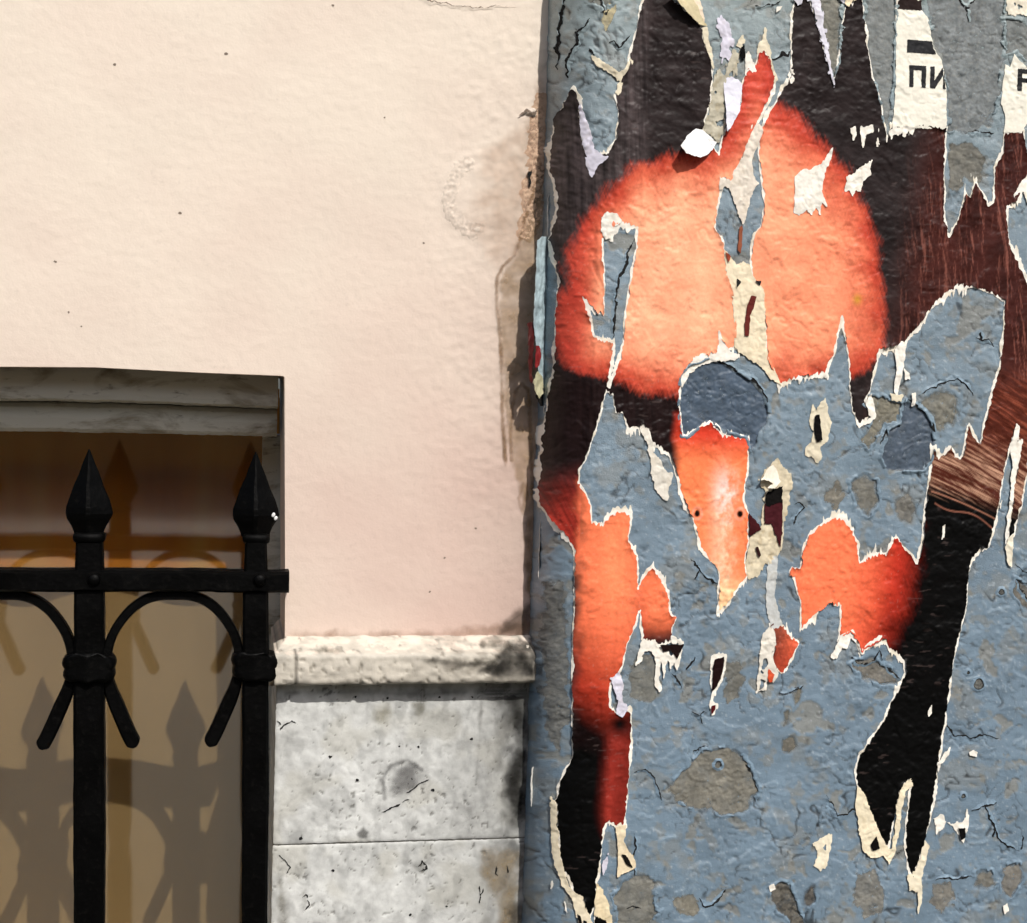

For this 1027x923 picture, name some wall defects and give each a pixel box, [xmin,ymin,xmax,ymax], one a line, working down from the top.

crack [421,0,516,12]
crack [547,0,632,78]
peeling [862,0,900,124]
peeling [922,0,1027,191]
damp [496,261,536,290]
damp [499,334,536,416]
peeling [677,358,772,454]
damp [503,425,536,511]
peeling [824,391,958,523]
crack [691,560,717,583]
damp [507,750,527,813]
crack [972,798,1024,851]